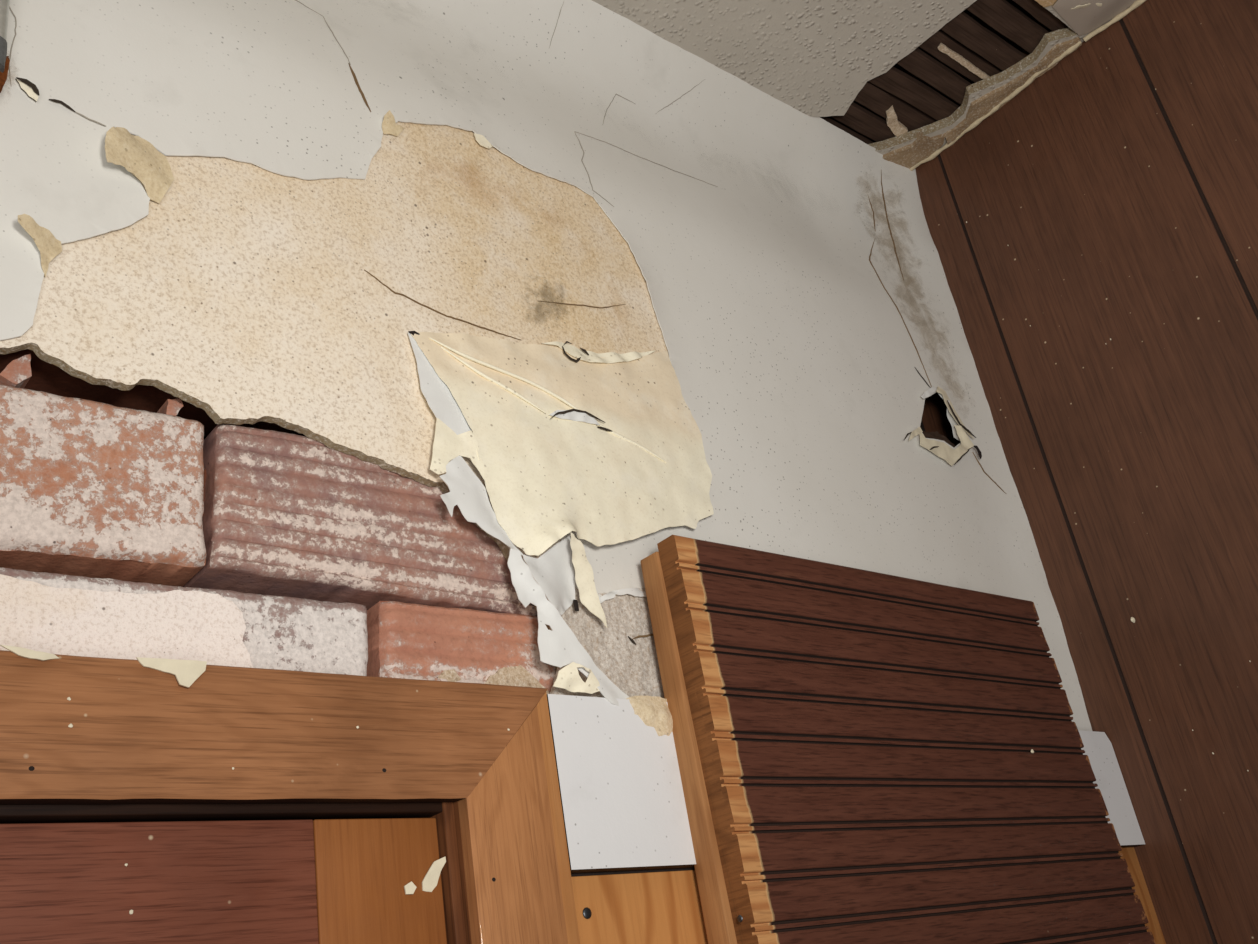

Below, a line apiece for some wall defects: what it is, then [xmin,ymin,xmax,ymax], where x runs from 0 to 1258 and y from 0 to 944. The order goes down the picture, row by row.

corrosion [0,56,10,93]
crack [295,0,371,112]
crack [574,82,718,207]
peeling [0,110,714,736]
spalling [904,386,982,466]